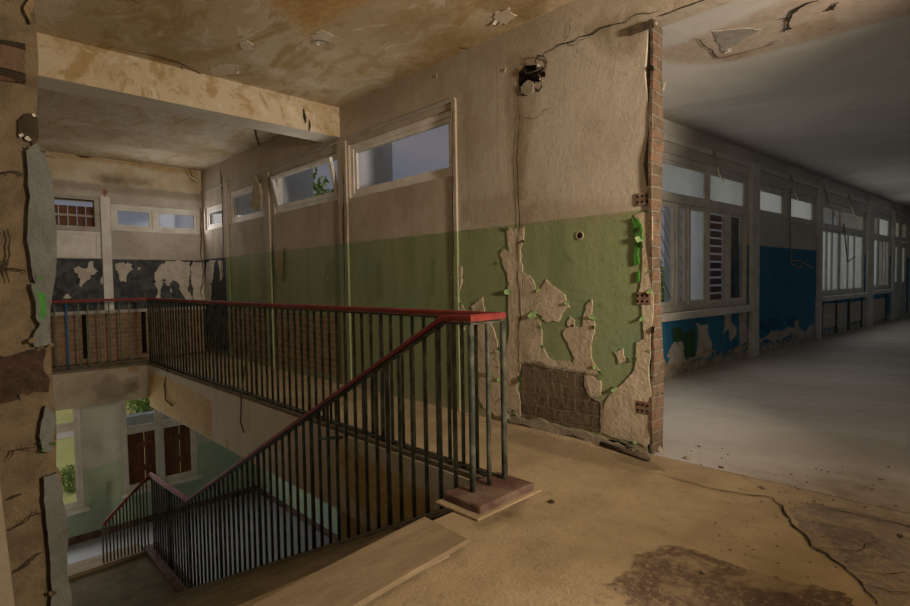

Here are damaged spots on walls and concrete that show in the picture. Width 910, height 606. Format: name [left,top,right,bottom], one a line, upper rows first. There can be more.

crack [543,0,704,55]
crack [695,0,839,59]
spalling [451,18,816,456]
peeling [73,261,103,287]
peeling [115,262,141,284]
peeling [153,260,223,304]
crack [660,473,906,605]